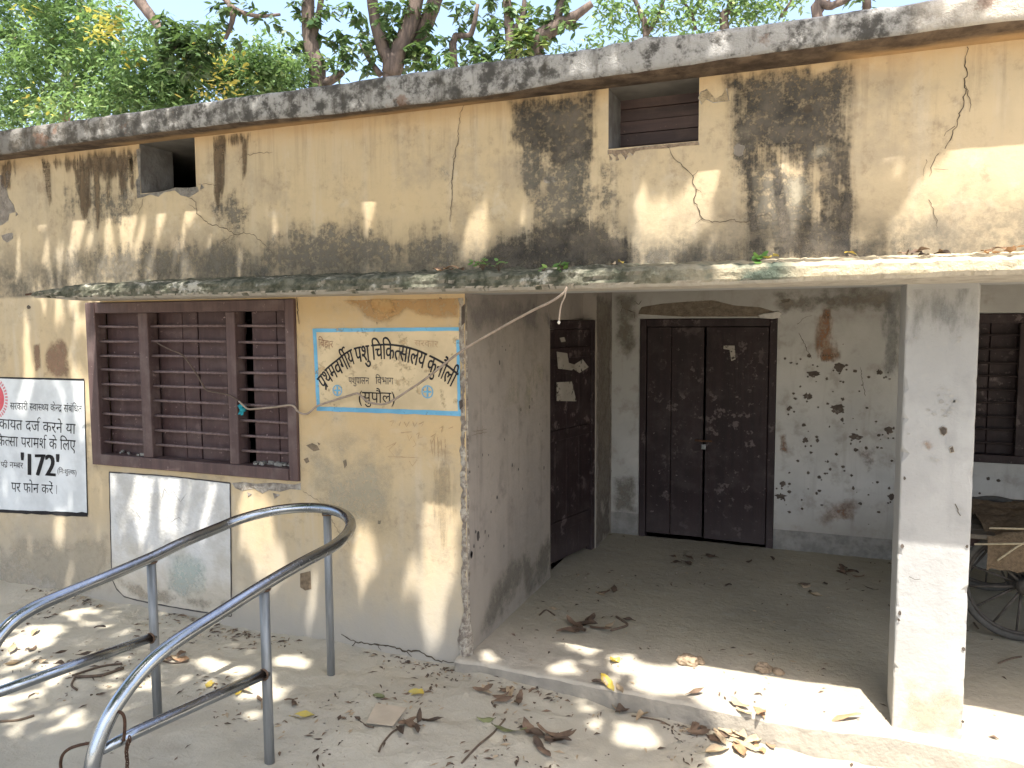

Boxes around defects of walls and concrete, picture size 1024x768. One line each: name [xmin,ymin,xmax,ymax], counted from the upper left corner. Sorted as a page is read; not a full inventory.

damp [42,150,136,228]
damp [212,134,247,229]
crack [450,108,463,209]
damp [480,65,869,269]
crack [669,148,804,224]
crack [924,47,971,228]
damp [95,223,457,280]
flaking render [638,298,791,319]
corrosion [816,309,839,361]
flaking render [783,353,895,452]
spalling [457,298,489,657]
flaking render [774,423,894,514]